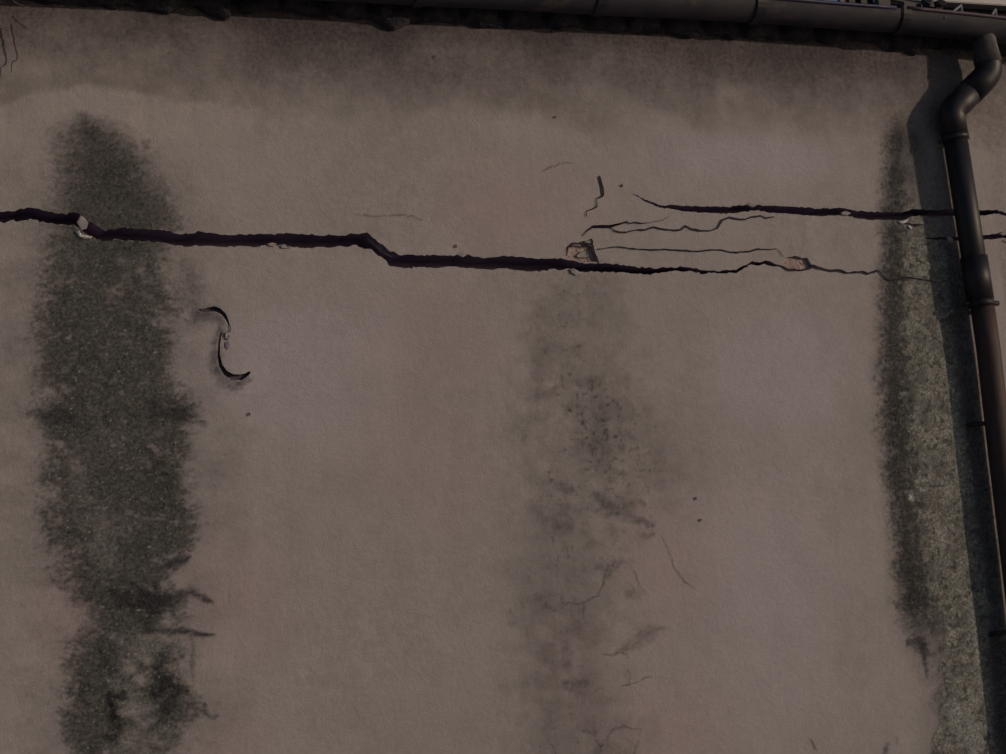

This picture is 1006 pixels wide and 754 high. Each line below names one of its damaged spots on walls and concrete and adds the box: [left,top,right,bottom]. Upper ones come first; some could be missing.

damp [0,0,974,110]
crack [0,176,958,276]
spalling [564,238,599,263]
spalling [781,256,813,271]
crack [812,264,936,283]
crack [979,210,1006,242]
crack [199,306,251,381]
damp [32,123,214,754]
damp [877,128,1006,754]